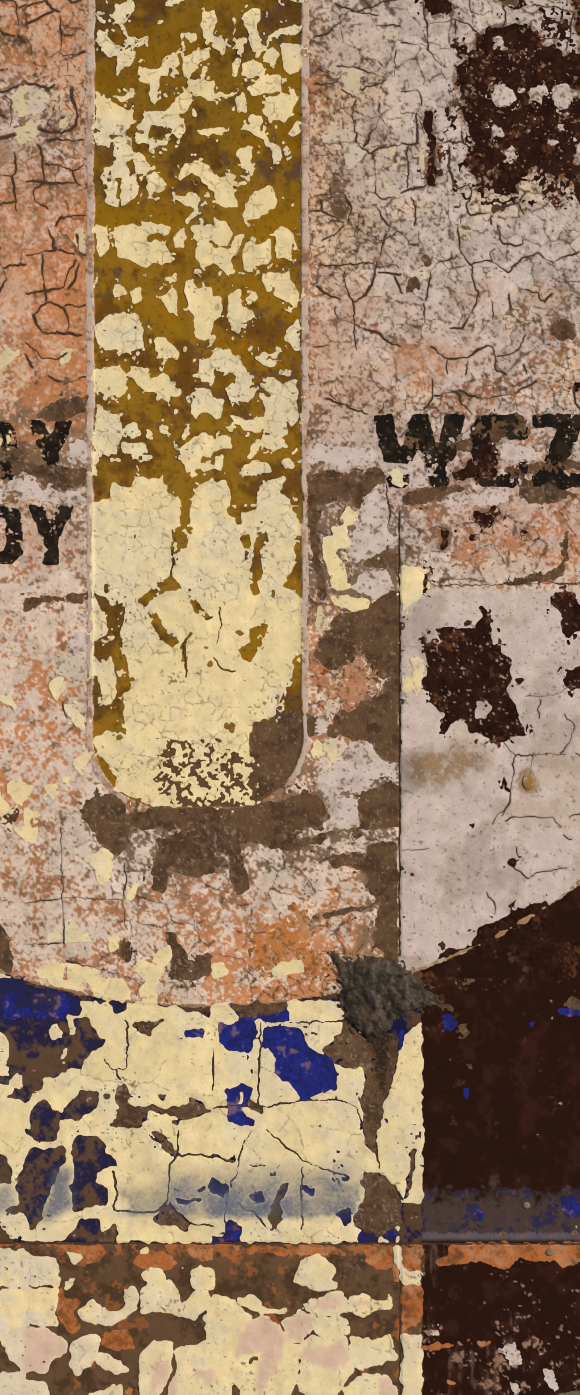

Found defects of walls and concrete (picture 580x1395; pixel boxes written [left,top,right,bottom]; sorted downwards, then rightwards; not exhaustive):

crack [0,0,87,385]
crack [310,0,580,415]
peeling [0,0,580,985]
peeling [0,923,580,1395]
peeling [414,894,580,1039]